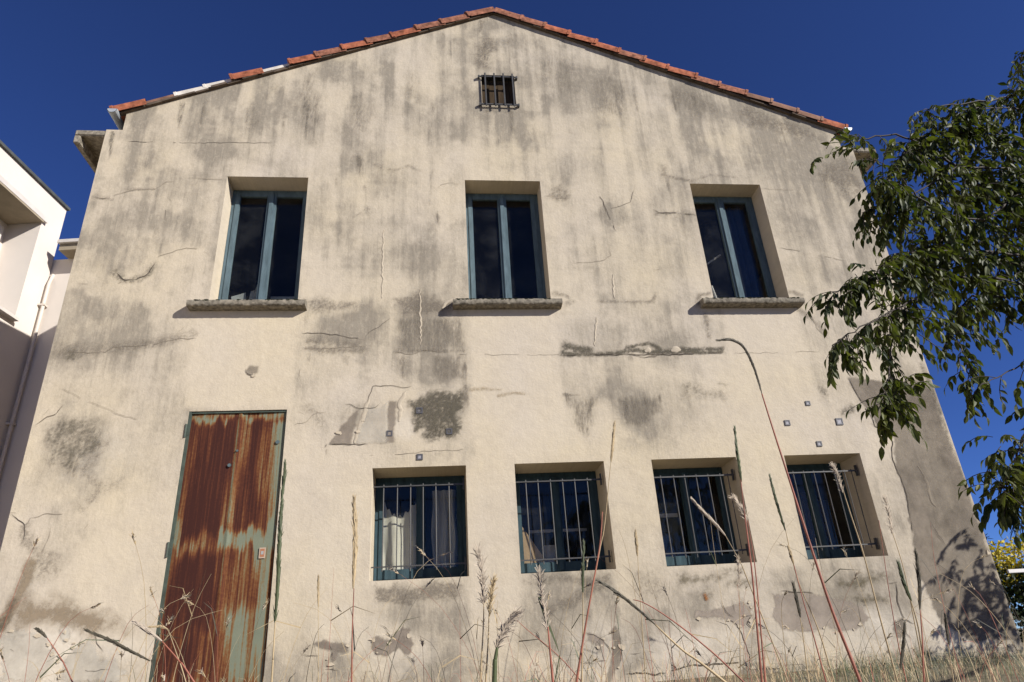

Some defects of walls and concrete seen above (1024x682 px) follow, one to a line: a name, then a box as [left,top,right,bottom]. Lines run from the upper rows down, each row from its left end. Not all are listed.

crack [577,193,686,263]
peeling [330,411,365,444]
peeling [387,401,396,441]